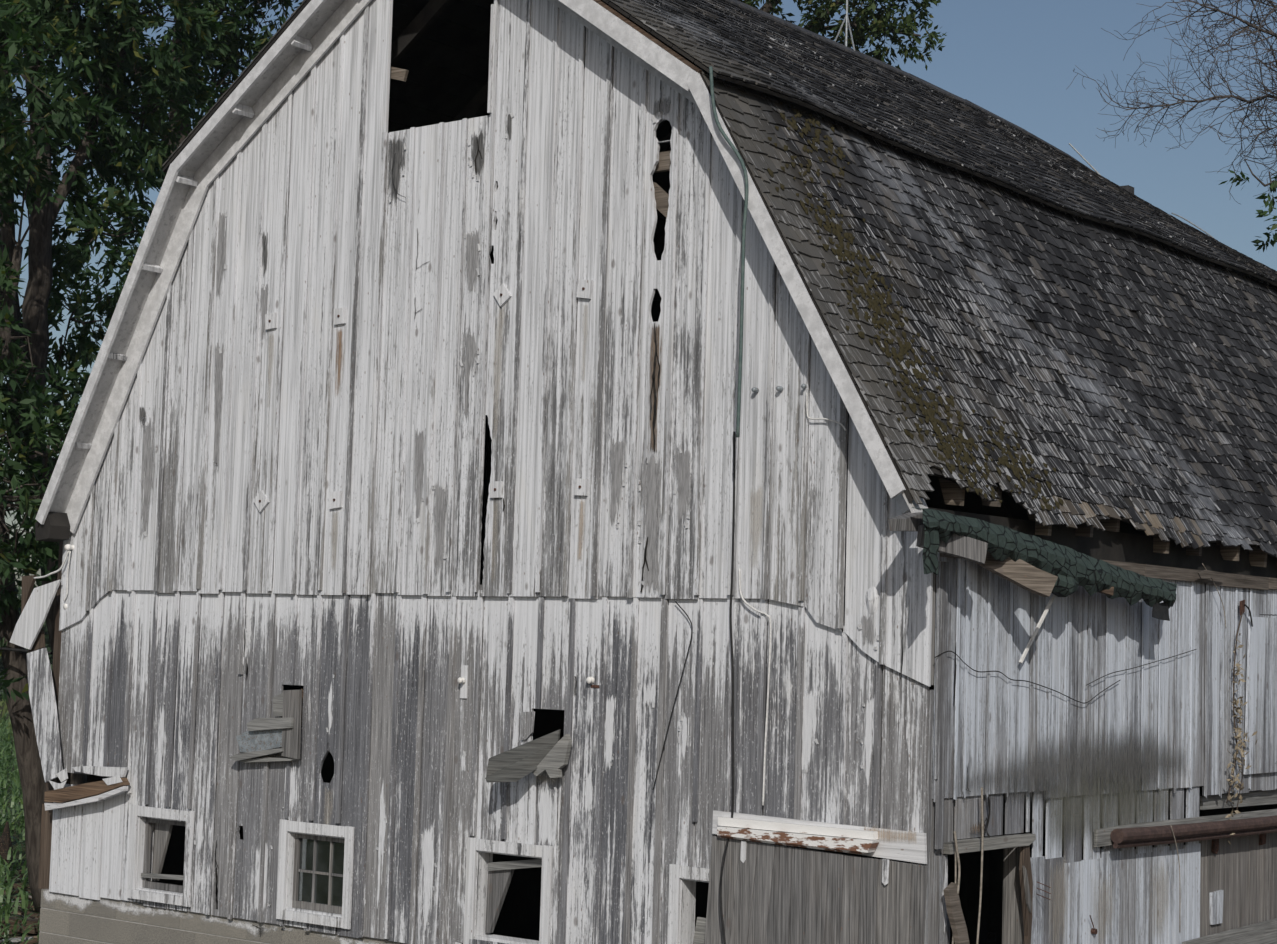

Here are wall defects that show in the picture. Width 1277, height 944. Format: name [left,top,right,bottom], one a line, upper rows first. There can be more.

peeling [387,138,406,202]
peeling [466,129,484,181]
peeling [260,232,268,343]
peeling [213,343,224,468]
peeling [139,408,157,540]
peeling [412,428,448,574]
peeling [155,702,167,783]
peeling [584,695,617,817]
peeling [251,842,273,935]
peeling [363,783,387,907]
peeling [420,819,437,930]
peeling [538,787,559,845]